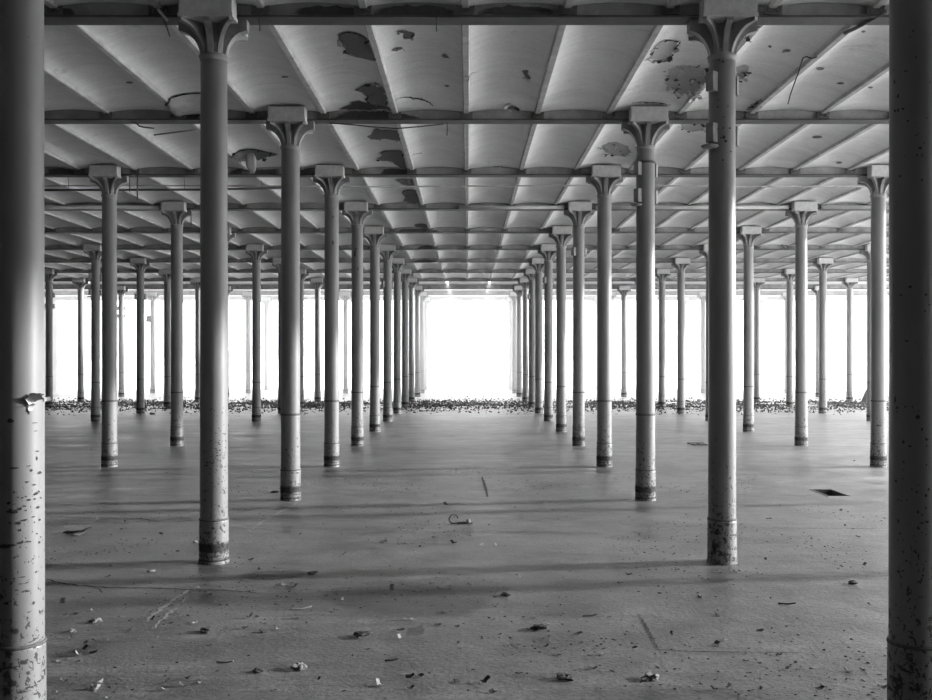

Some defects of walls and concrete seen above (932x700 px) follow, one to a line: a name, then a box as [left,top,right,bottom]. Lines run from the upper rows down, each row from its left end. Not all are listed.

peeling [337,32,376,61]
peeling [392,30,415,51]
peeling [646,40,709,103]
peeling [355,82,388,106]
spalling [230,149,277,173]
peeling [367,129,420,204]
peeling [600,142,631,157]
peeling [26,393,51,431]
peeling [6,451,42,543]